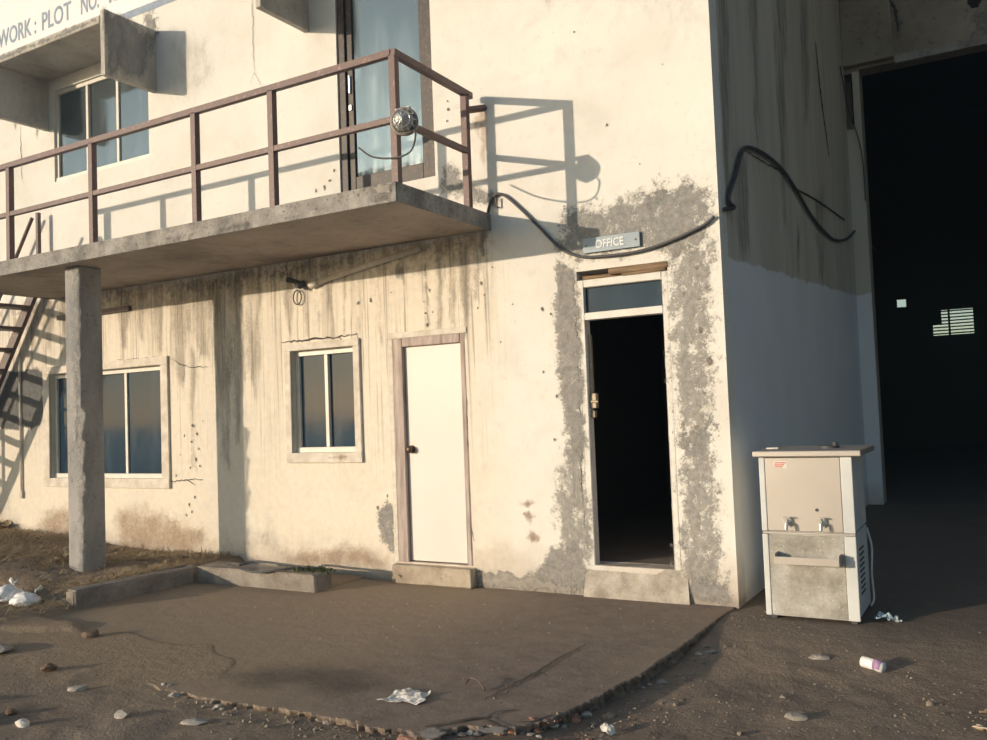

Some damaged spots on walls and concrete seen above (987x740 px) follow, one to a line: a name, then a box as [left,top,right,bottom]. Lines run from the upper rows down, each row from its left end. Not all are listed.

damp [47,265,86,568]
crack [281,333,358,343]
flaking render [376,495,395,551]
peeling [662,246,729,605]